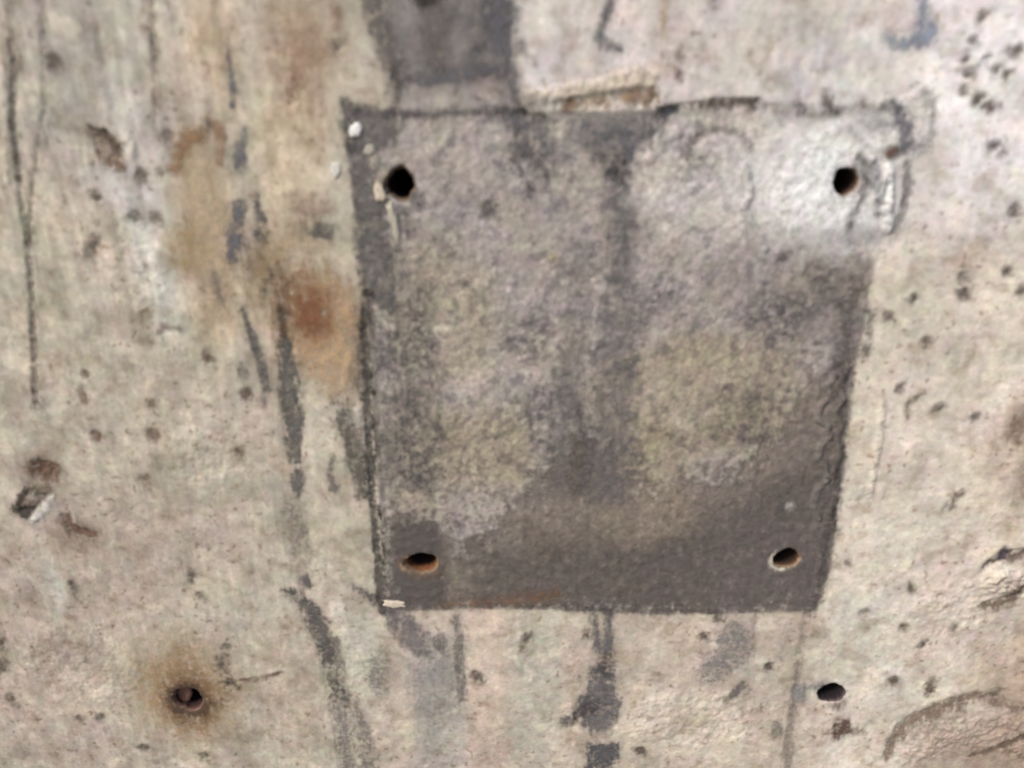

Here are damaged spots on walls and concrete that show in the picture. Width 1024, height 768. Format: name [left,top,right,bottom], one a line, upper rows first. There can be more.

rust [259,256,361,393]